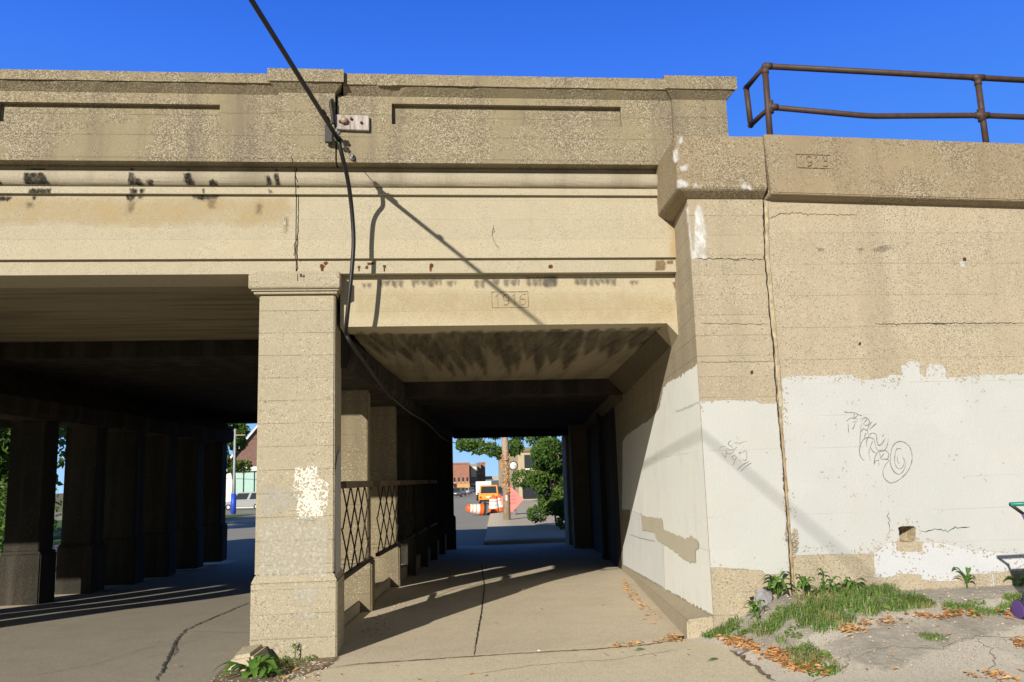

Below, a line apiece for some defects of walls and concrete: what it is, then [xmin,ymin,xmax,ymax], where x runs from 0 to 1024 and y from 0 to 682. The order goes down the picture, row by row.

leakage [24,169,51,207]
leakage [95,169,154,219]
leakage [184,170,220,207]
crack [695,201,858,595]
peeling [622,360,1024,614]
peeling [258,450,341,619]
crack [20,602,250,681]